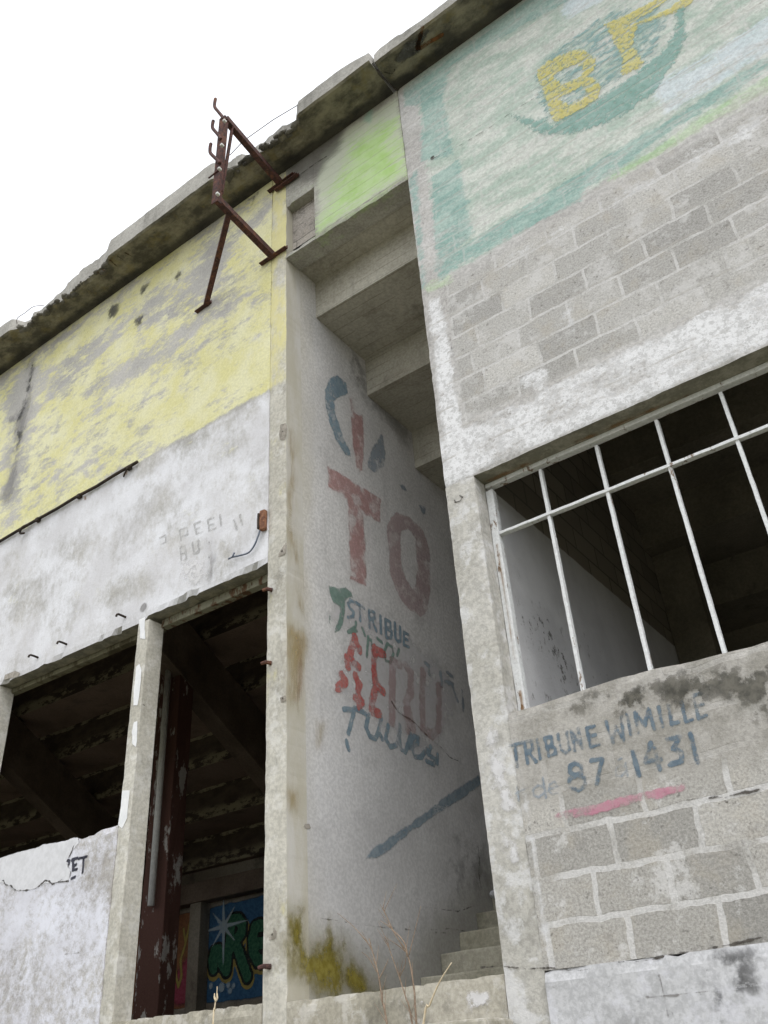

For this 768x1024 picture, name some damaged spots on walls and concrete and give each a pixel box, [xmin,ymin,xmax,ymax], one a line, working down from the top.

leakage [16,379,31,441]
leakage [3,470,14,497]
peeling [133,664,142,705]
peeling [118,790,130,828]
crack [2,839,79,891]
leakage [339,966,367,992]
leakage [722,953,753,988]